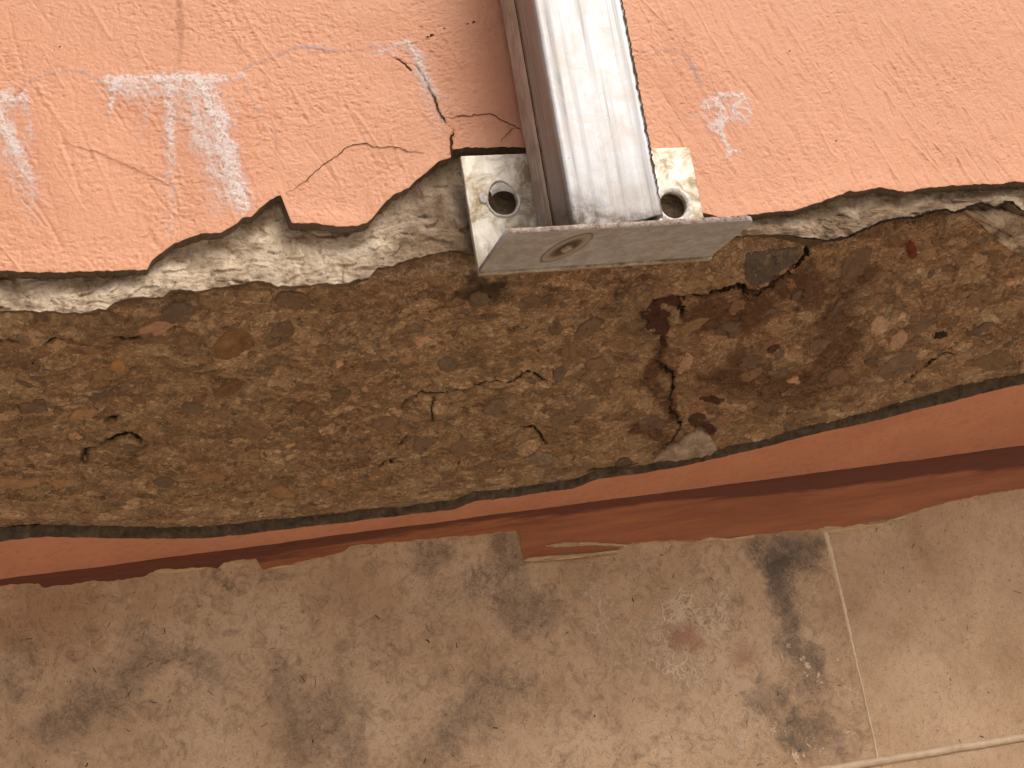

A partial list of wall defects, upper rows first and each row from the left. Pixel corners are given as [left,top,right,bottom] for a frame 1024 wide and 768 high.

crack [395,58,522,156]
crack [289,143,421,191]
spalling [0,153,1024,529]
crack [412,370,545,418]
crack [656,344,683,450]
peeling [813,516,906,533]
water stain [754,536,840,702]